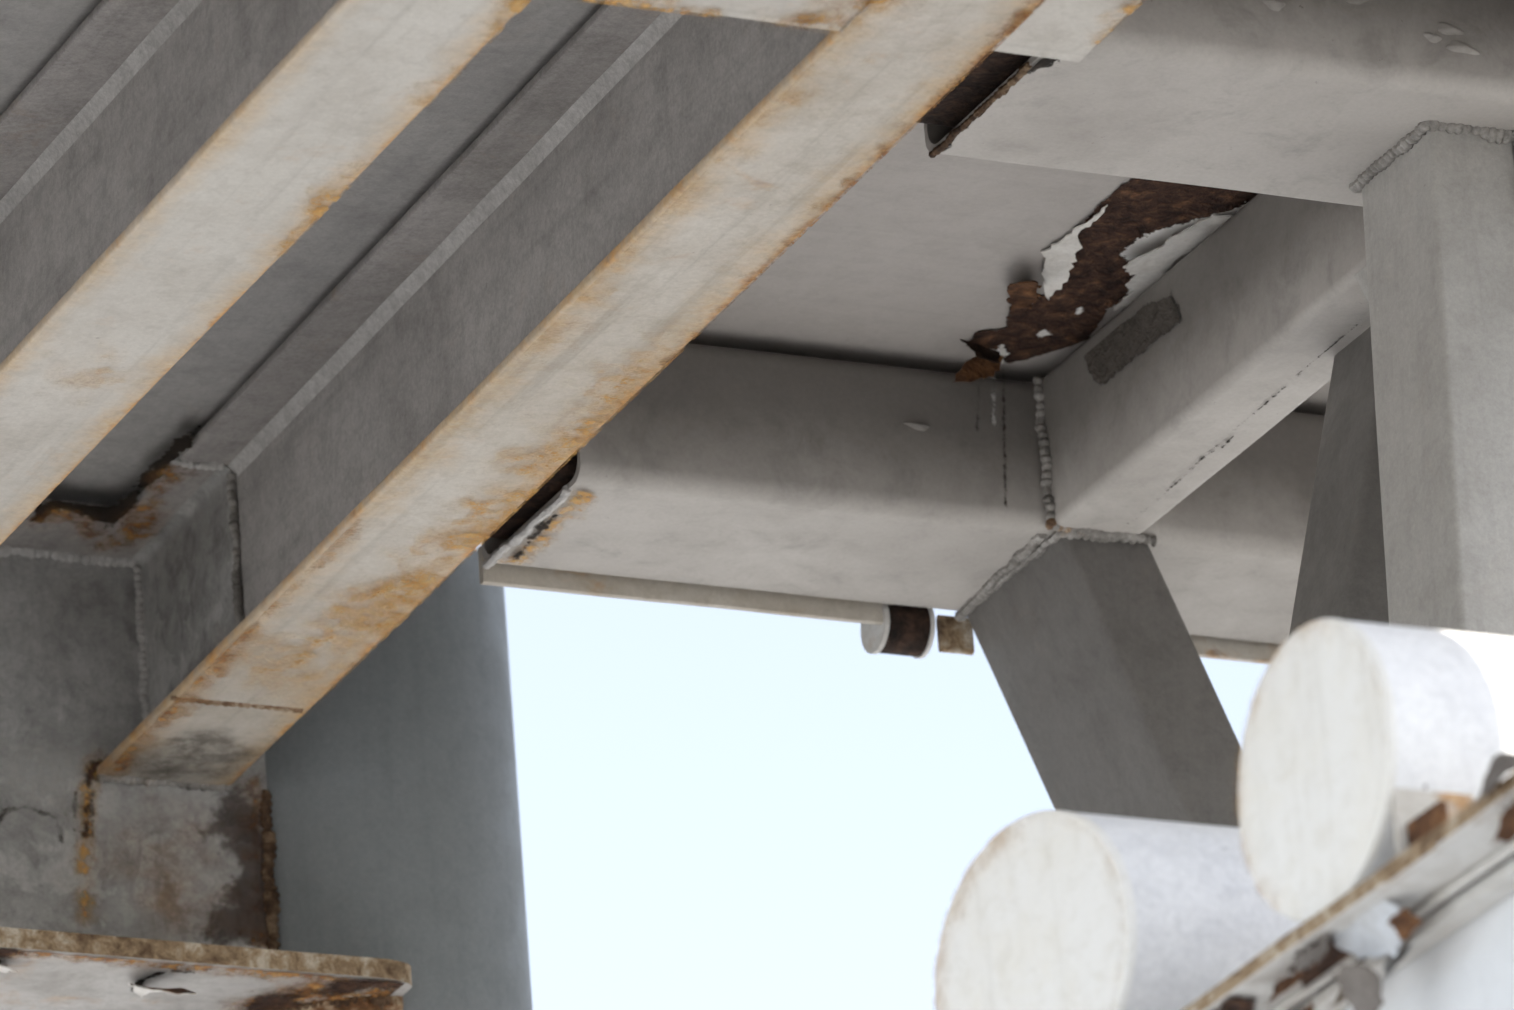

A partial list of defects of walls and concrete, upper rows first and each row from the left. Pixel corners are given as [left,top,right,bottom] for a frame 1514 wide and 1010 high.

corrosion [1027,58,1060,74]
corrosion [966,178,1258,367]
peeling [952,339,1003,383]
peeling [1084,295,1180,385]
corrosion [443,352,681,563]
corrosion [77,602,277,918]
corrosion [205,780,274,947]
peeling [1473,752,1514,804]
peeling [1491,800,1514,845]
peeling [128,983,197,998]
corrosion [0,949,405,1010]
peeling [1219,901,1423,1010]